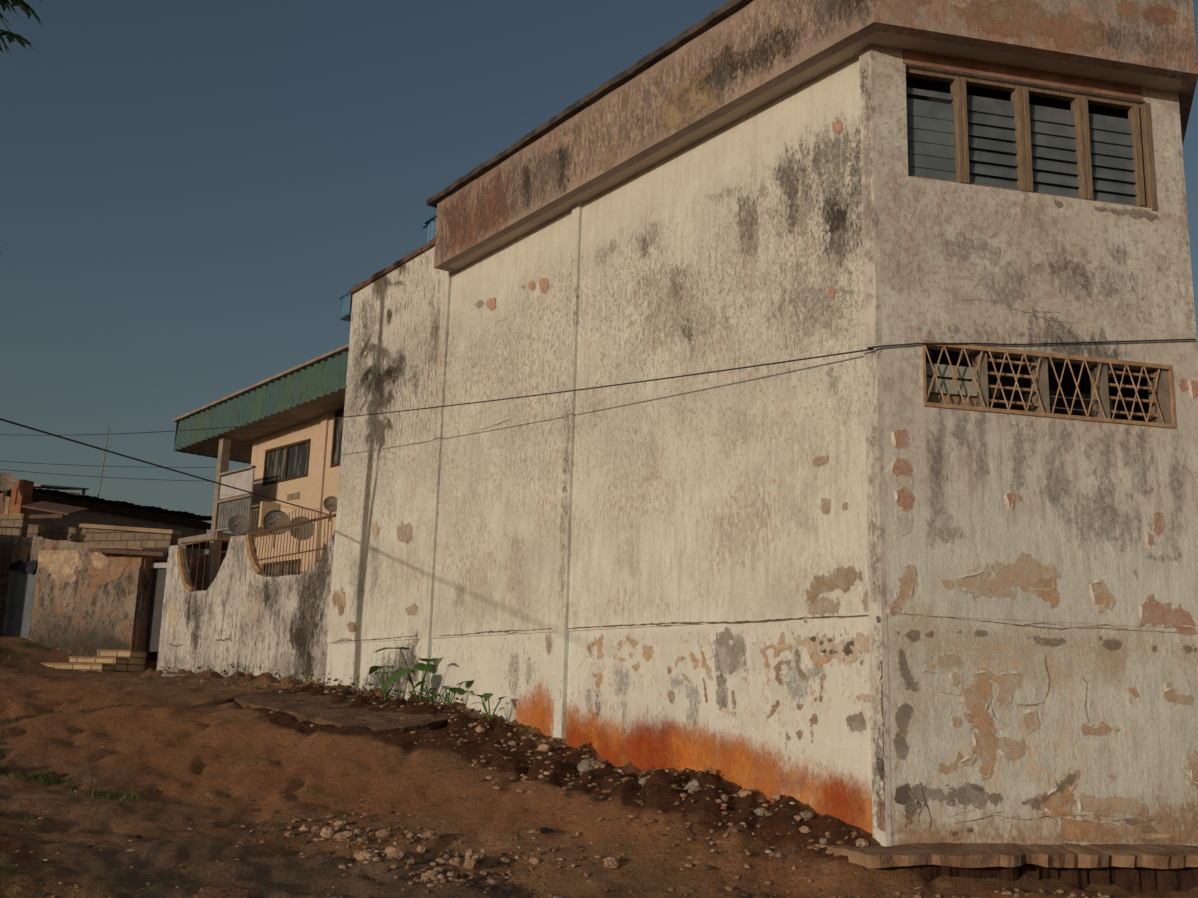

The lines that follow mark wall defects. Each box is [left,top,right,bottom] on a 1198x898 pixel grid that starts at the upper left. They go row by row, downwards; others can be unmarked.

leakage [670,21,799,125]
leakage [771,120,863,267]
peeling [889,416,915,536]
leakage [30,567,132,657]
leakage [247,543,333,680]
peeling [587,636,654,689]
peeling [806,566,869,616]
peeling [939,553,1061,609]
peeling [1138,594,1198,670]
corrosion [516,692,873,833]
peeling [668,627,1041,832]
crack [876,776,1174,829]